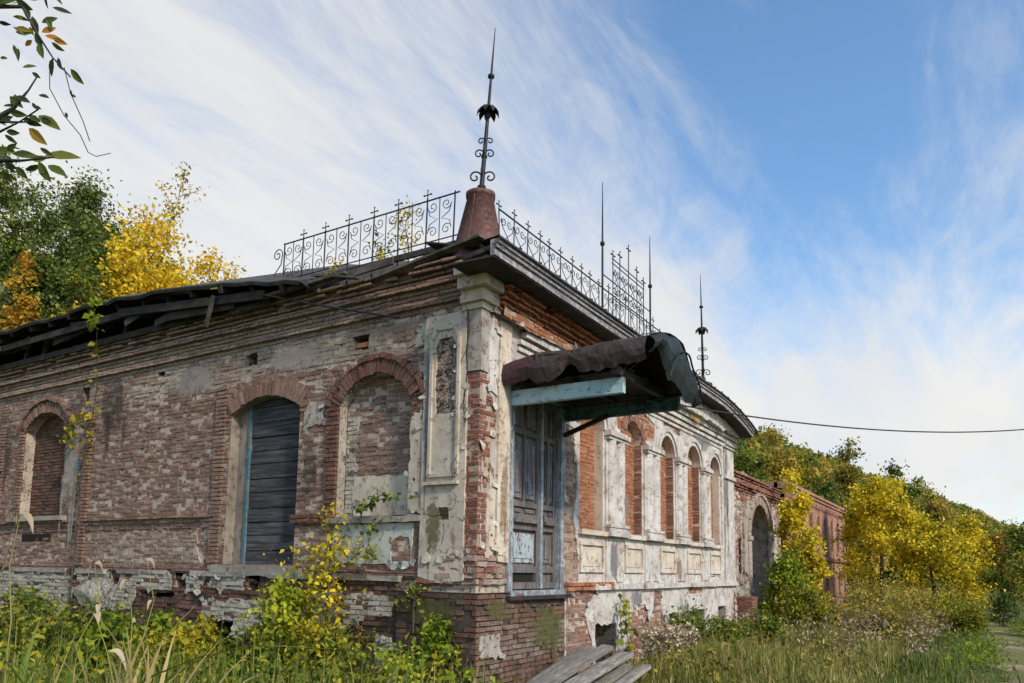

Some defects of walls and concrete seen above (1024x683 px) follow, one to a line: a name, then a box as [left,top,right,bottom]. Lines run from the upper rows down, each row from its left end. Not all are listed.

spalling [332,304,579,585]
flaking render [617,414,681,442]
spalling [0,527,274,667]
peeling [302,588,394,630]
flaking render [529,425,664,680]
flaking render [686,587,704,597]